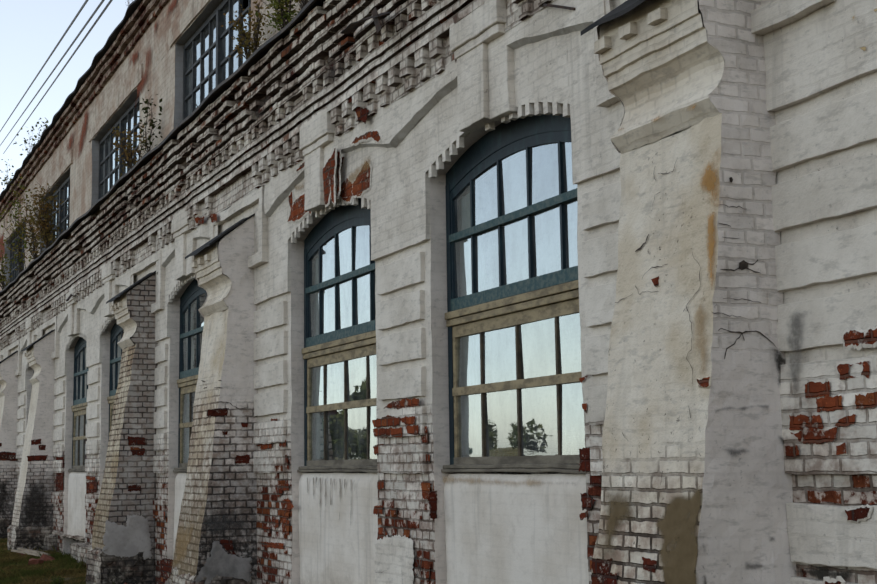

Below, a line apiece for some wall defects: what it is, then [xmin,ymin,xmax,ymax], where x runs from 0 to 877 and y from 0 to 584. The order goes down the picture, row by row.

peeling [322,97,383,208]
peeling [288,190,312,224]
crack [683,253,760,383]
crack [712,298,776,359]
spalling [842,325,877,351]
flaking render [372,398,428,455]
flaking render [785,361,877,459]
spalling [421,481,437,519]
flaking render [579,447,602,520]
spalling [845,504,873,523]
flaking render [591,558,618,584]
flaking render [642,557,657,573]